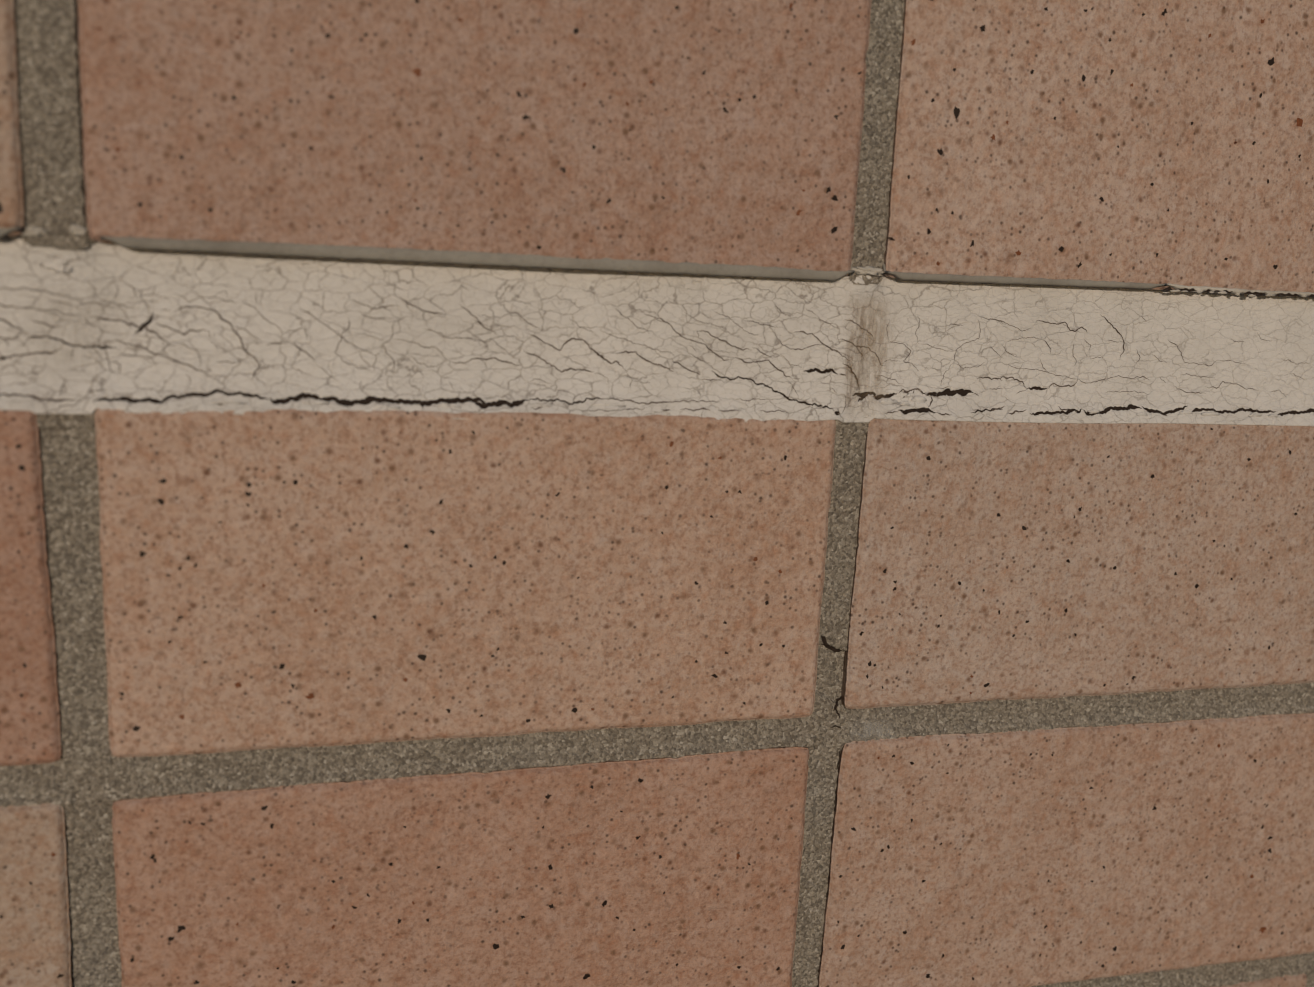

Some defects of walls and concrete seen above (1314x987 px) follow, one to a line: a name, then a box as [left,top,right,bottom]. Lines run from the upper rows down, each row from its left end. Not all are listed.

crack [0,279,1314,418]